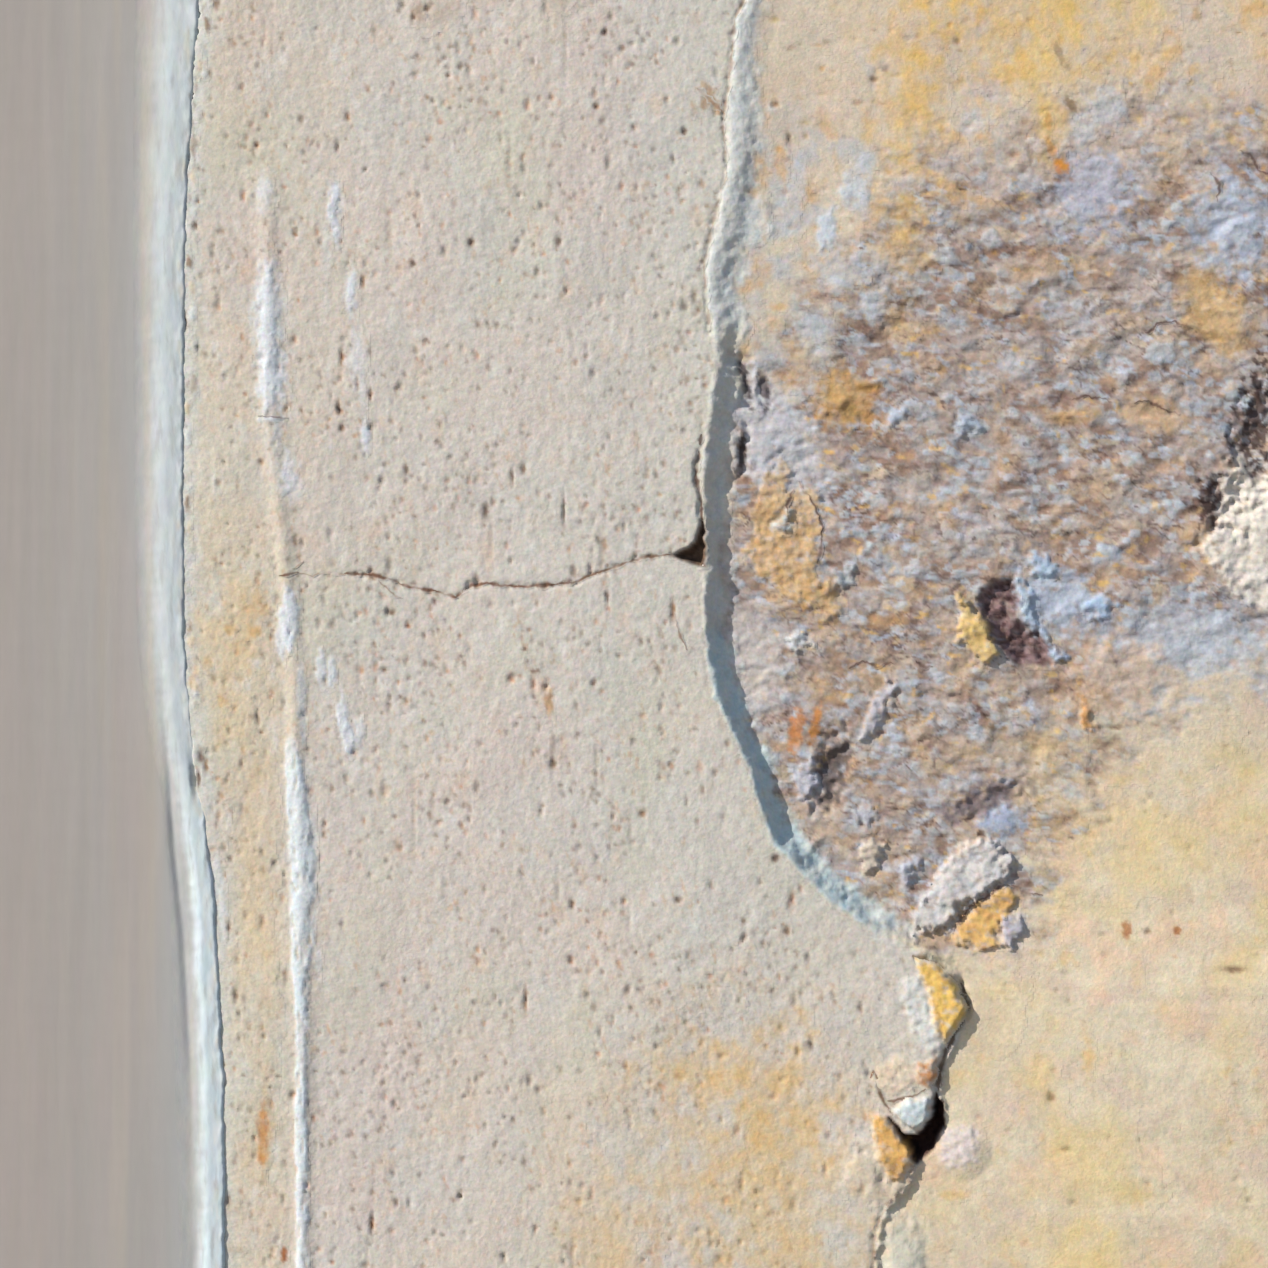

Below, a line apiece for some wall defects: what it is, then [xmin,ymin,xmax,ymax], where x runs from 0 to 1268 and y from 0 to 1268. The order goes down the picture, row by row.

crack [279,434,710,599]
crack [673,611,687,650]
spalling [696,0,1268,992]
crack [869,951,986,1268]